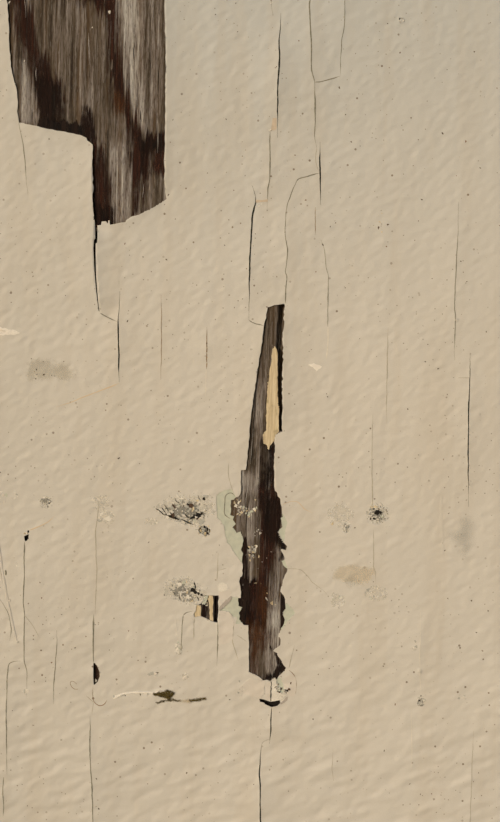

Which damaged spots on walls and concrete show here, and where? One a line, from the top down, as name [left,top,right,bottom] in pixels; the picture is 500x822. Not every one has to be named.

peeling [7,0,166,320]
peeling [146,304,296,704]
crack [249,0,281,326]
crack [285,0,345,359]
crack [452,237,460,357]
crack [464,378,472,507]
crack [259,682,272,822]